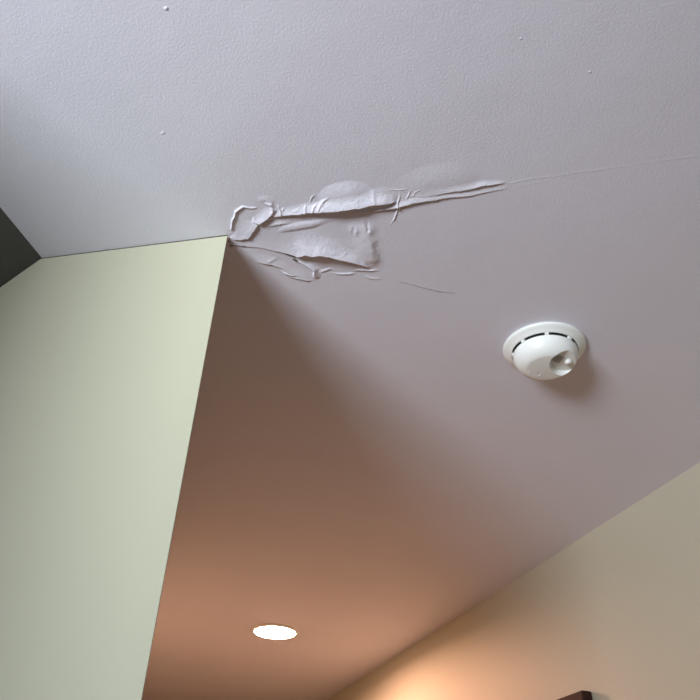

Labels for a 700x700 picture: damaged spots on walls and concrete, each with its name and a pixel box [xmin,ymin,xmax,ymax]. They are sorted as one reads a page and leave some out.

peeling [228,170,510,281]